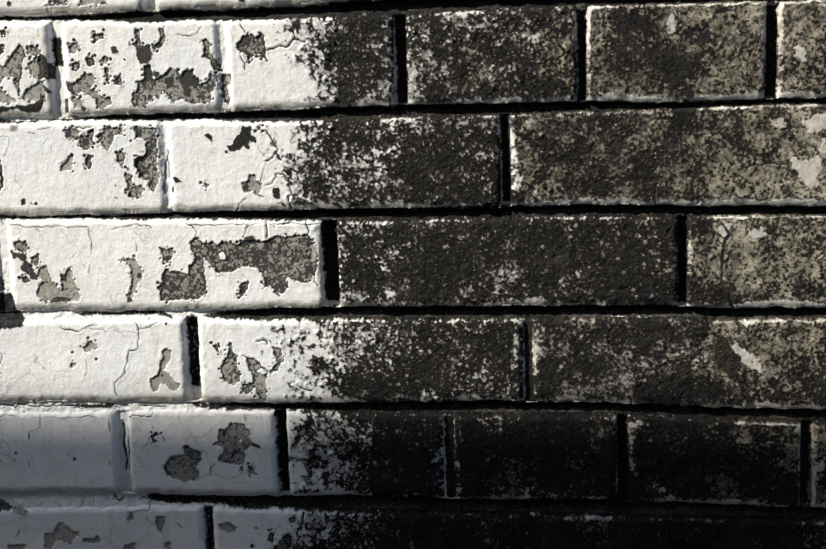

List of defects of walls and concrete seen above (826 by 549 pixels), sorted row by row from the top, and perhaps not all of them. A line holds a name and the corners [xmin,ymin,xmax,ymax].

peeling [0,42,56,106]
peeling [65,28,125,113]
peeling [129,26,223,109]
crack [0,136,10,190]
peeling [59,124,161,200]
peeling [10,240,82,304]
crack [1,219,92,274]
peeling [157,233,319,303]
crack [0,321,165,471]
peeling [210,341,284,401]
peeling [164,445,203,483]
peeling [212,422,261,476]